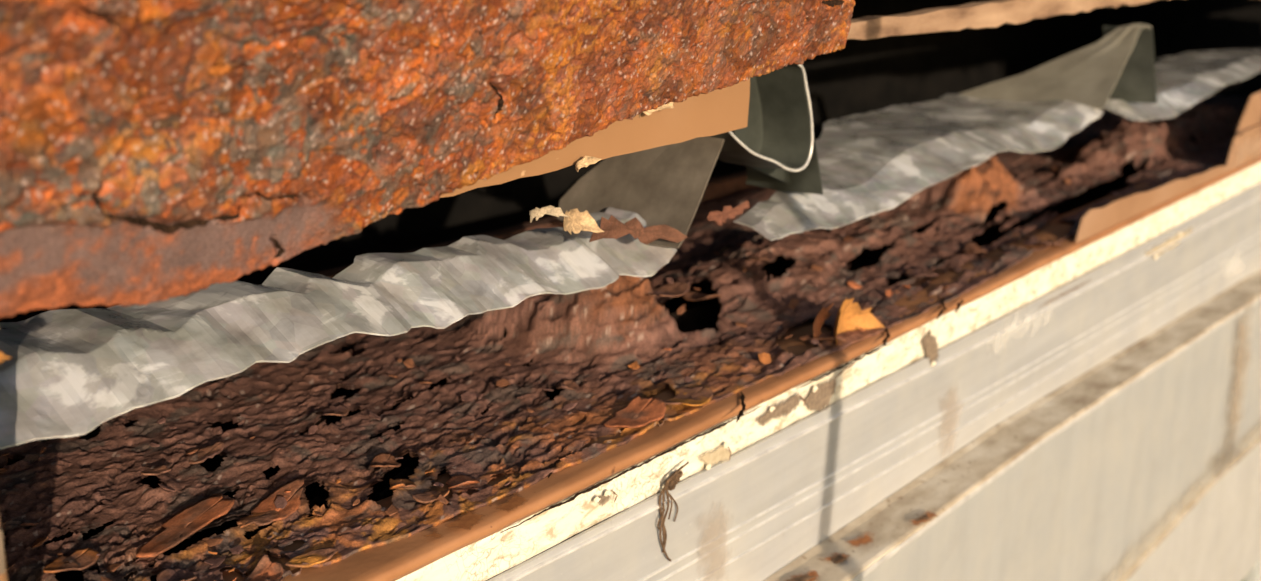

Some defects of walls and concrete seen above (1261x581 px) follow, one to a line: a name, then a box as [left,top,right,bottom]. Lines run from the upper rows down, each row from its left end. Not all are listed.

rust [529,205,687,245]
rust [707,201,750,226]
spalling [669,304,732,347]
rust [799,298,885,345]
peeling [922,327,939,367]
peeling [758,362,856,426]
spalling [307,496,328,517]
spalling [376,467,415,502]
peeling [593,490,618,506]
rust [136,494,235,581]
rust [43,548,99,573]
rust [243,547,337,581]